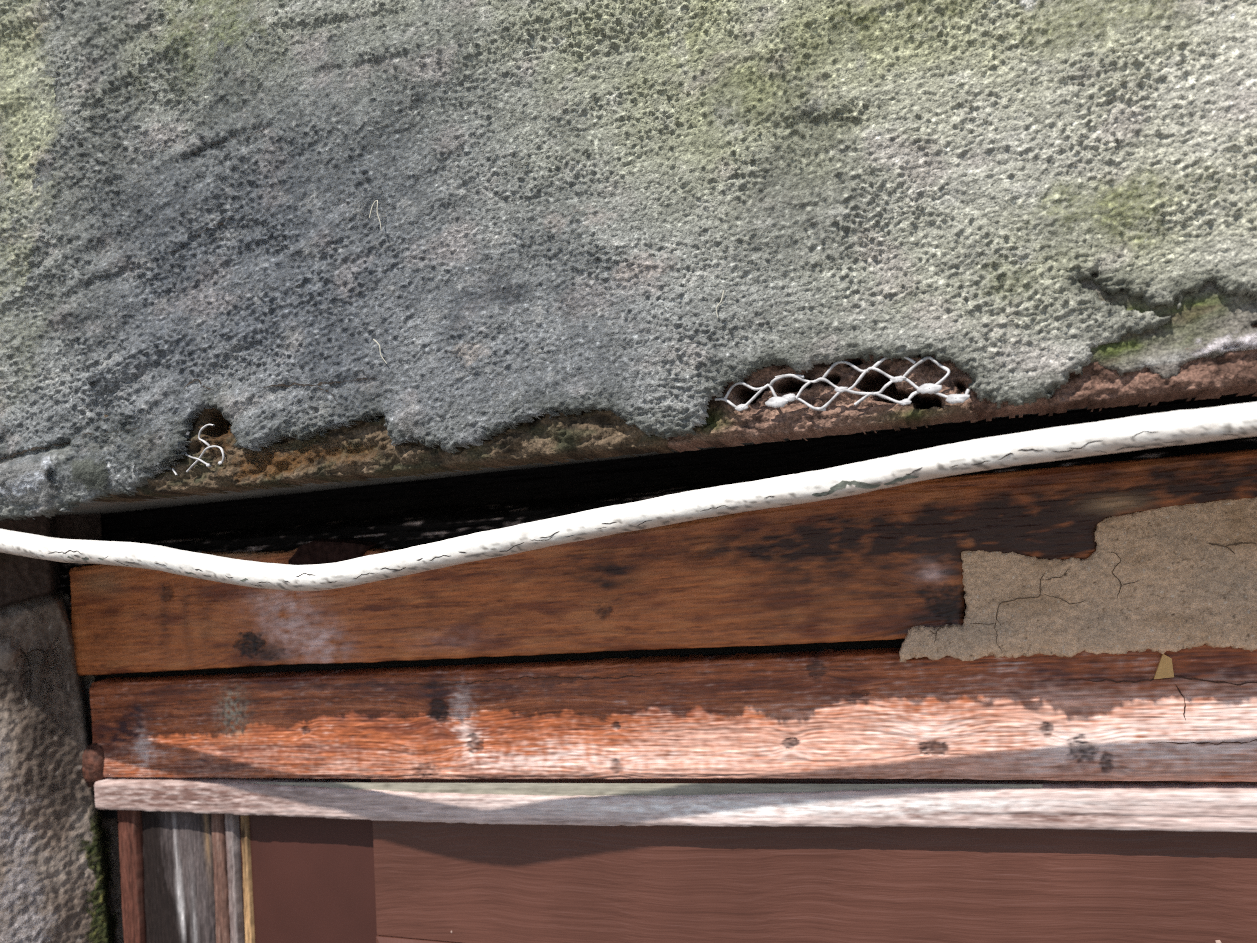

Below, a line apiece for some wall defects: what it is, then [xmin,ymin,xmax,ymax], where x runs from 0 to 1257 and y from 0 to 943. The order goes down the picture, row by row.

spalling [70,273,1257,504]
crack [931,569,1085,649]
crack [1112,552,1139,599]
crack [1208,542,1256,554]